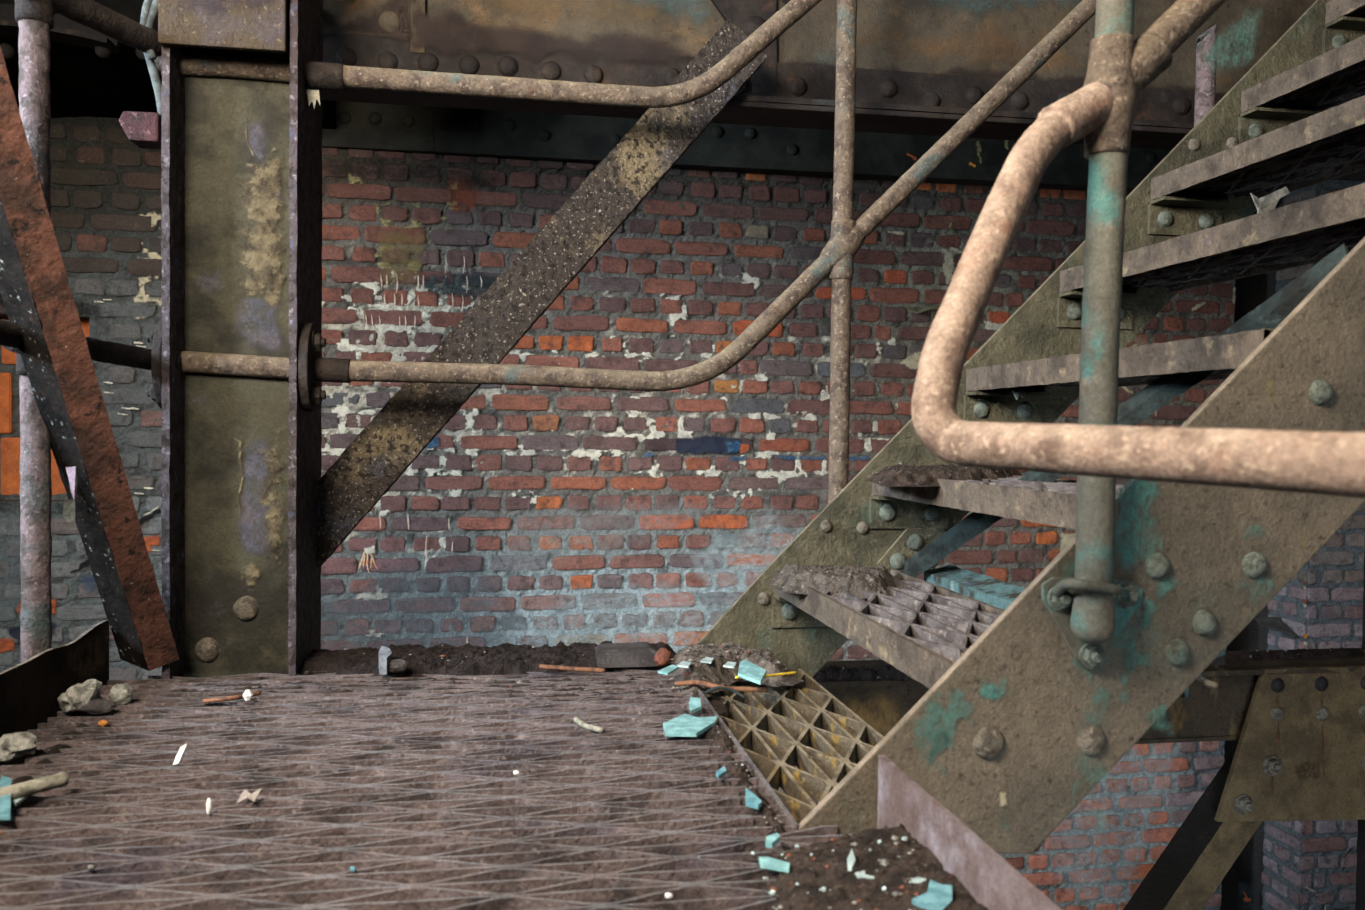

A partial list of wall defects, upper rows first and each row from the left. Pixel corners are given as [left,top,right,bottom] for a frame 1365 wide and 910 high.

water stain [610,335,653,362]
efflorescence [321,406,378,456]
efflorescence [404,408,479,497]
water stain [503,394,694,478]
water stain [697,386,830,499]
efflorescence [358,546,378,572]
efflorescence [425,518,453,566]
efflorescence [324,577,499,647]
peeling [915,680,1005,763]